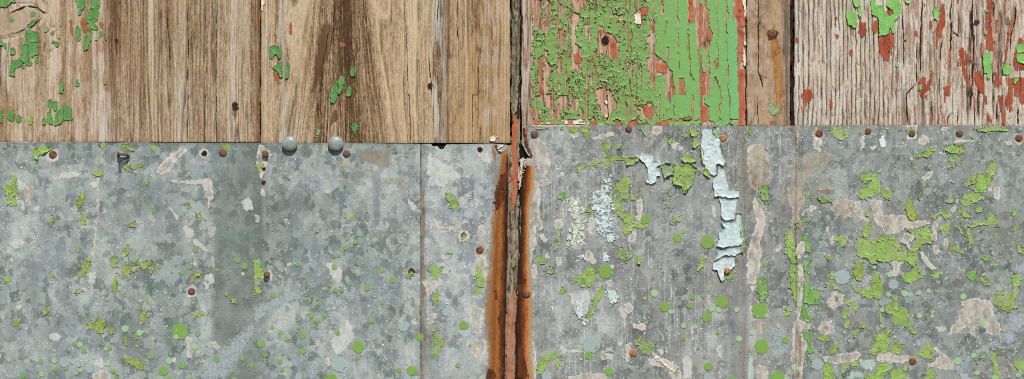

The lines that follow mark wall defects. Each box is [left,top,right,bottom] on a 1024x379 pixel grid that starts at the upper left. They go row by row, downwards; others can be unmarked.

peeling [0,79,80,126]
peeling [0,0,107,76]
peeling [269,34,290,84]
peeling [330,65,355,103]
corrosion [770,25,782,123]
peeling [530,0,754,325]
peeling [779,0,1024,379]
corrosion [484,127,537,379]